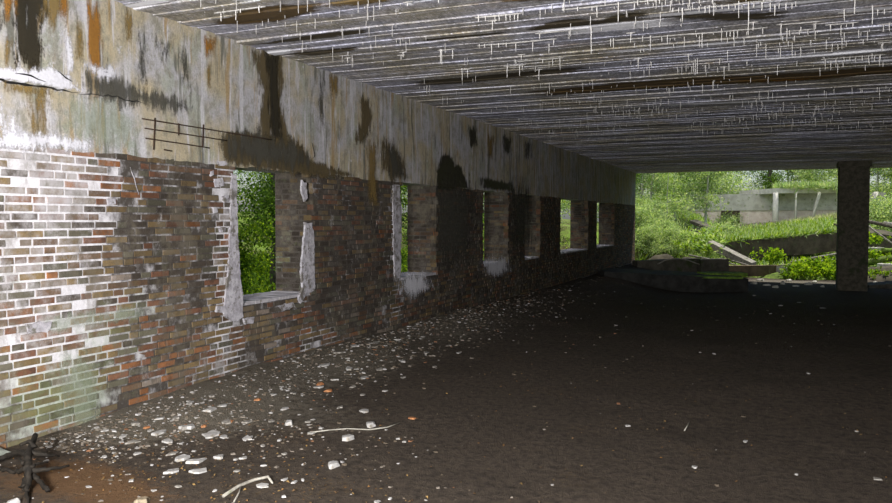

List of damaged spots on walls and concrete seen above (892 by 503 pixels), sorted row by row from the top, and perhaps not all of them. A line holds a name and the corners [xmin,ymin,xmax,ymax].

corrosion [4,0,17,20]
leakage [0,0,50,71]
corrosion [43,0,67,29]
leakage [62,34,73,76]
crack [0,71,142,103]
corrosion [75,0,101,74]
leakage [82,33,193,113]
leakage [124,0,171,10]
spalling [142,118,272,152]
leakage [219,48,350,179]
leakage [355,96,406,205]
leakage [434,153,532,267]